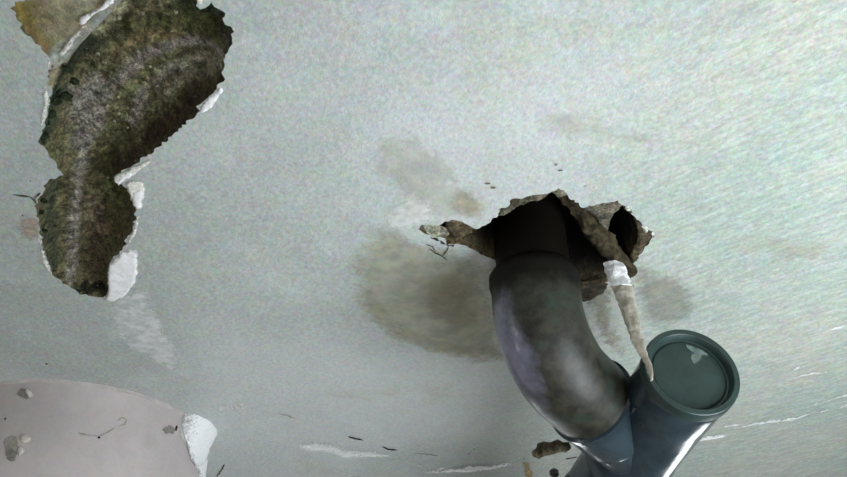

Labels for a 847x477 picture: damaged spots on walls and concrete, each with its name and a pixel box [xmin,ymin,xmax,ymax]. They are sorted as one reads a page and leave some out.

spalling [10,0,234,301]
hole [419,188,655,302]
spalling [163,413,217,477]